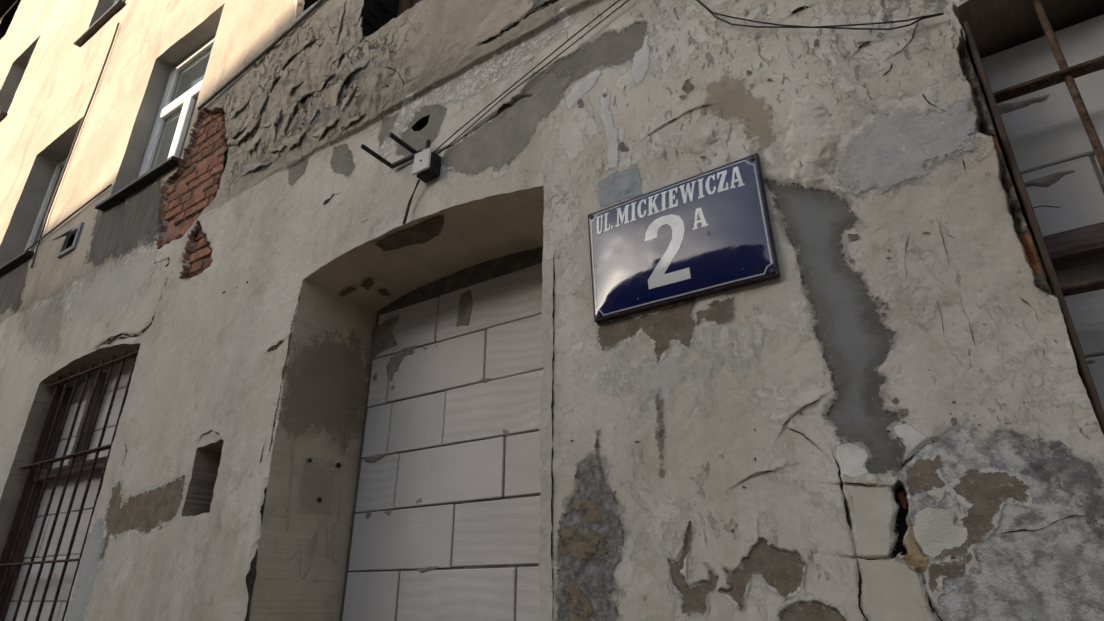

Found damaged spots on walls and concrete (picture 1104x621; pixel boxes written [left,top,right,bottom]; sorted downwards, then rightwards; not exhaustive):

flaking render [155,0,370,279]
damp [377,5,586,167]
damp [441,69,618,175]
damp [631,33,650,85]
flaking render [956,28,1050,293]
flaking render [95,470,190,579]
flaking render [553,440,624,621]
flaking render [665,516,848,621]
crack [783,400,894,621]
crack [921,548,967,621]
flaking render [888,401,1104,621]
crack [1001,515,1078,534]